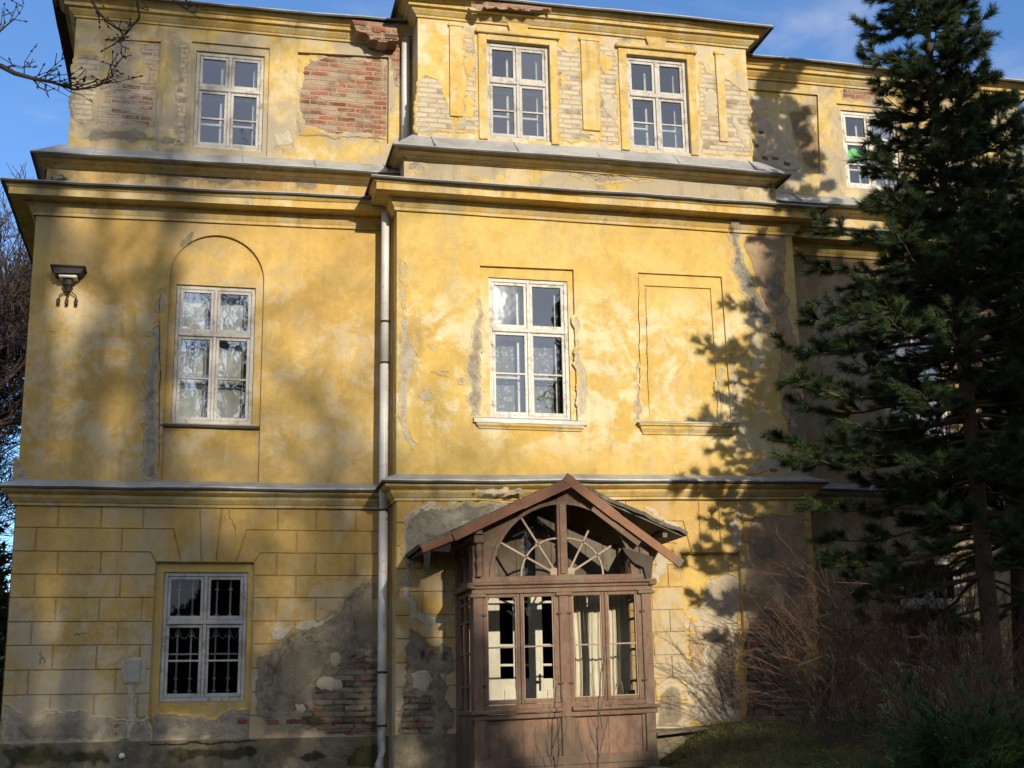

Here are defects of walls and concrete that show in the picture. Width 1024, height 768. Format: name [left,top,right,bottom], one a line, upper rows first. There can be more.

peeling [68,40,160,126]
peeling [274,110,386,146]
peeling [351,47,402,98]
peeling [413,34,479,136]
peeling [557,37,646,146]
peeling [666,42,800,171]
peeling [139,285,164,481]
peeling [395,258,438,451]
peeling [431,288,486,416]
peeling [744,234,800,427]
peeling [1,584,378,744]
flaking render [398,629,455,735]